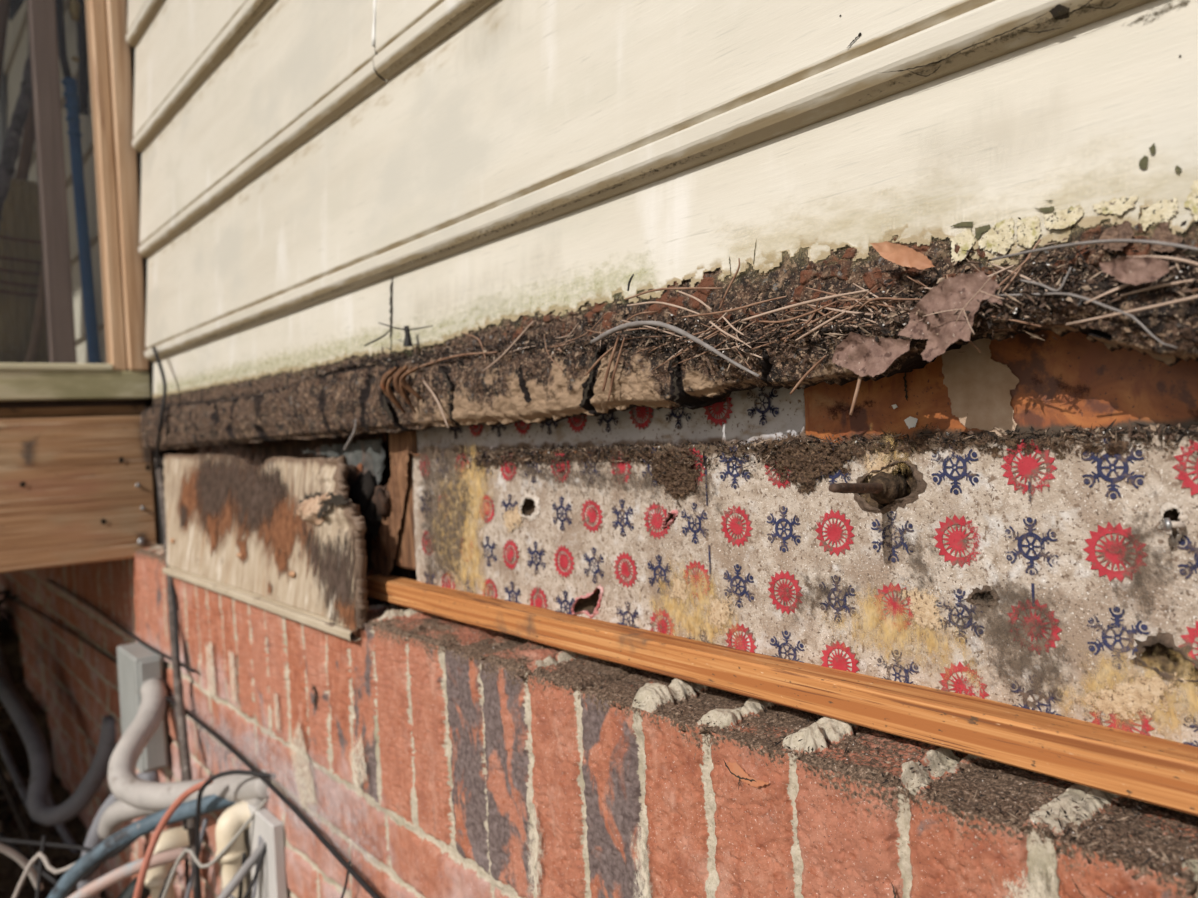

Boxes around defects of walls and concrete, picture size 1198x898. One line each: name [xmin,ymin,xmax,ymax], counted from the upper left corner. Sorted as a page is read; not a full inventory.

peeling [1139,143,1156,169]
peeling [950,180,1198,262]
damp [175,439,364,633]
damp [527,809,542,897]
damp [631,828,651,898]